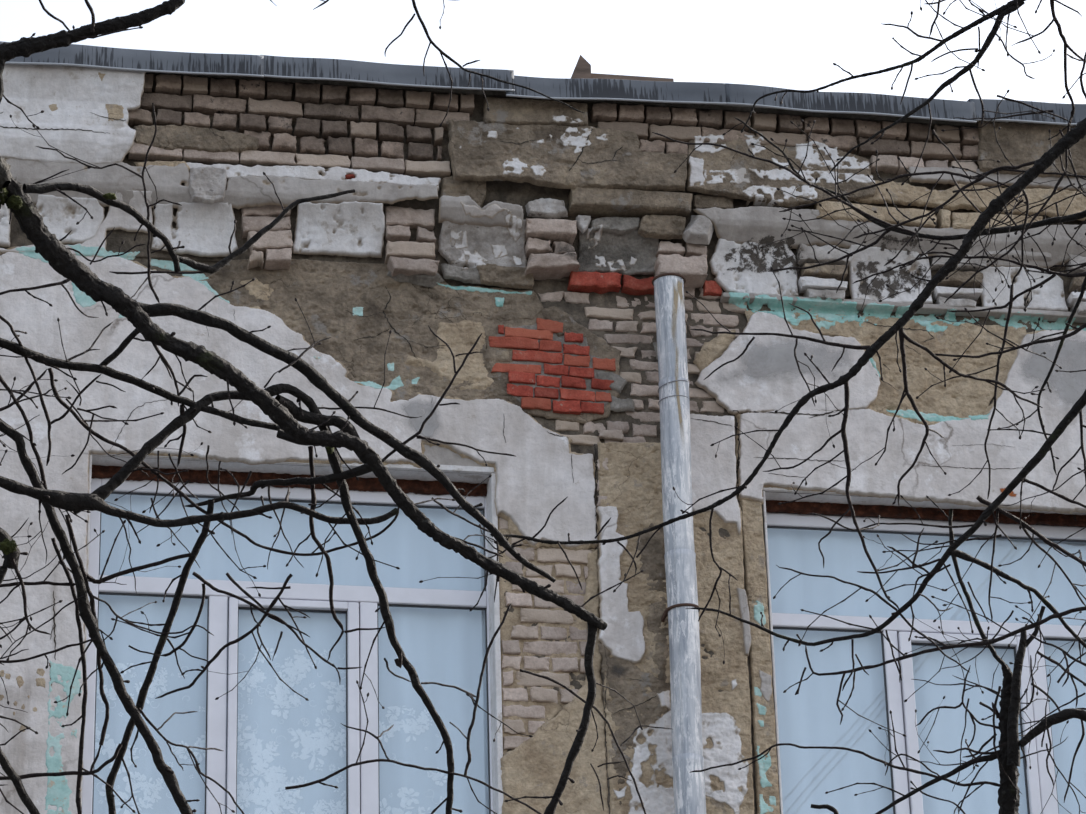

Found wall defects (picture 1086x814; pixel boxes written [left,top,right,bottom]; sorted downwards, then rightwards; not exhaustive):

peeling [536,115,608,154]
peeling [16,246,48,263]
peeling [68,244,140,260]
peeling [72,282,96,308]
flaking render [150,133,1086,814]